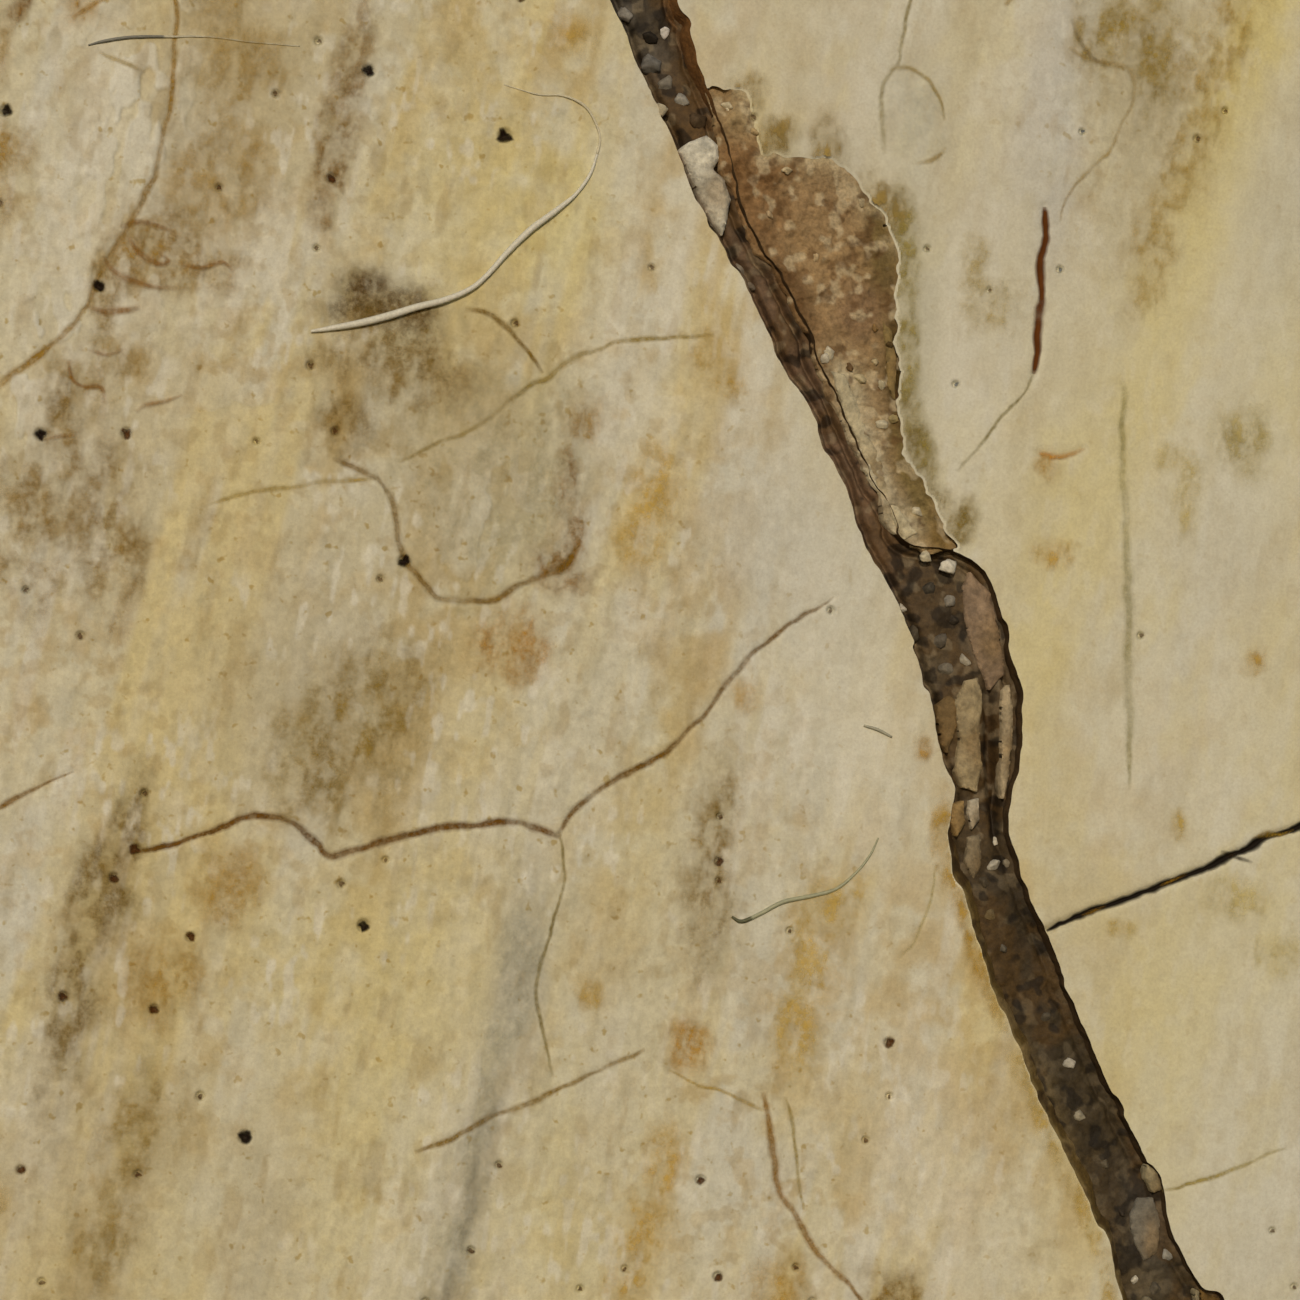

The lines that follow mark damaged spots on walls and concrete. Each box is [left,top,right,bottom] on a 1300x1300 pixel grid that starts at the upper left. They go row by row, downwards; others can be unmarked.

crack [168,0,179,111]
crack [7,328,72,377]
crack [516,374,553,396]
spalling [705,86,957,555]
crack [610,0,1300,1300]
crack [141,610,816,859]
crack [0,781,50,809]
crack [535,913,556,1025]